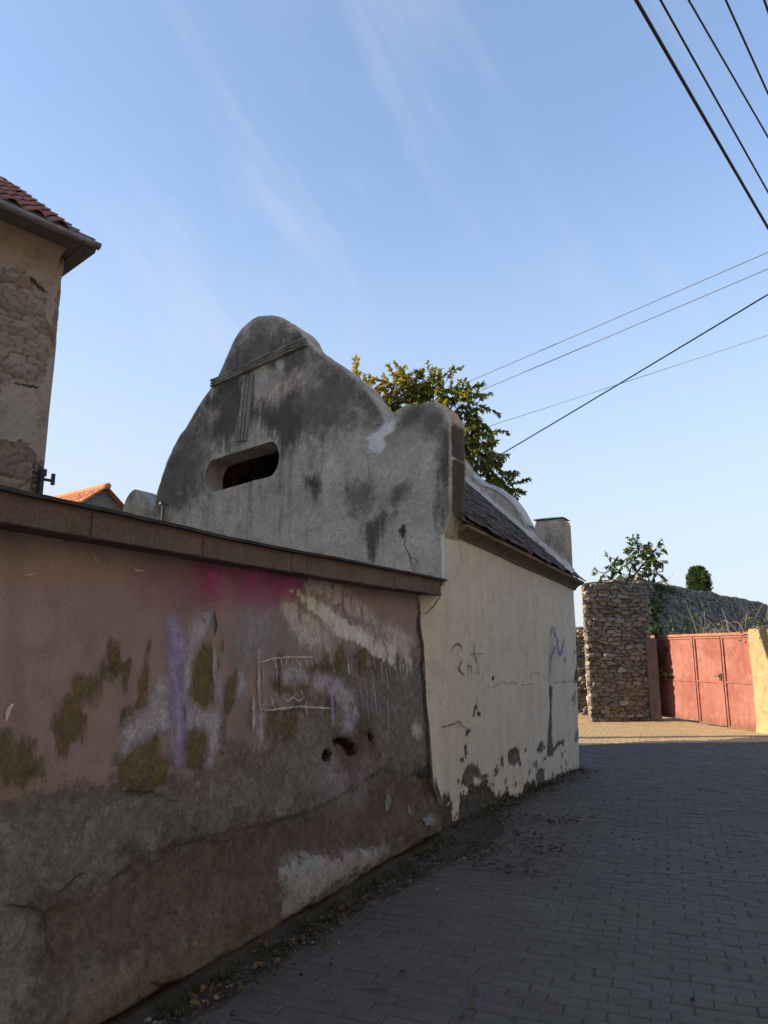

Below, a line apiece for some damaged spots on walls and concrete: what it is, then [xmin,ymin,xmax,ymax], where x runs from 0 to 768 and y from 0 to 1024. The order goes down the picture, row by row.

water stain [156,322,379,511]
water stain [366,514,387,561]
water stain [403,406,465,518]
crack [418,593,466,823]
crack [5,871,87,965]
flaking render [0,639,568,1024]